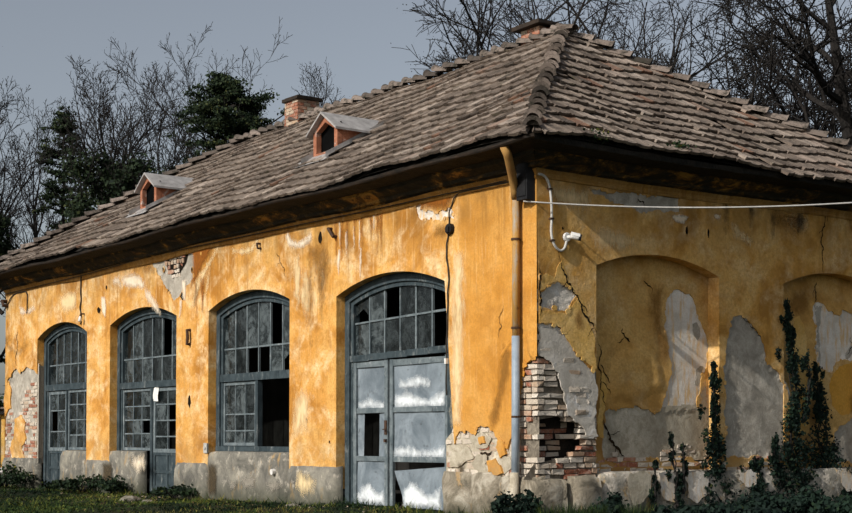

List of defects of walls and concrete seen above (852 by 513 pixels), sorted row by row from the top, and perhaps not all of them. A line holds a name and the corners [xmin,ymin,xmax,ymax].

flaking render [590,187,679,216]
flaking render [153,252,202,301]
leakage [295,249,326,311]
crack [536,271,544,314]
flaking render [4,363,44,463]
flaking render [446,261,709,505]
crack [558,251,630,456]
flaking render [723,302,852,492]